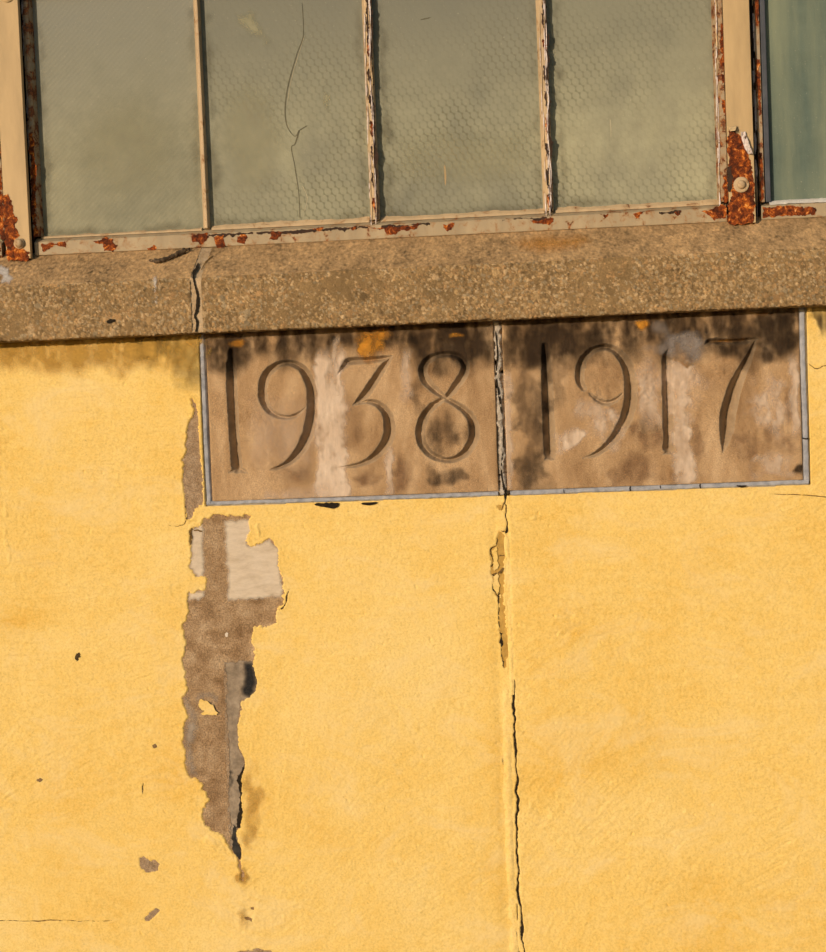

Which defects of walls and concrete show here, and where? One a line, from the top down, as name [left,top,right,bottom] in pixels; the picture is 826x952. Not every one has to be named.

corrosion [0,152,30,262]
corrosion [28,133,66,252]
corrosion [93,237,117,252]
crack [192,256,213,332]
corrosion [191,232,225,248]
corrosion [701,130,817,226]
leakage [0,322,491,497]
leakage [503,308,801,488]
flaking render [182,399,285,881]
crack [502,680,525,952]